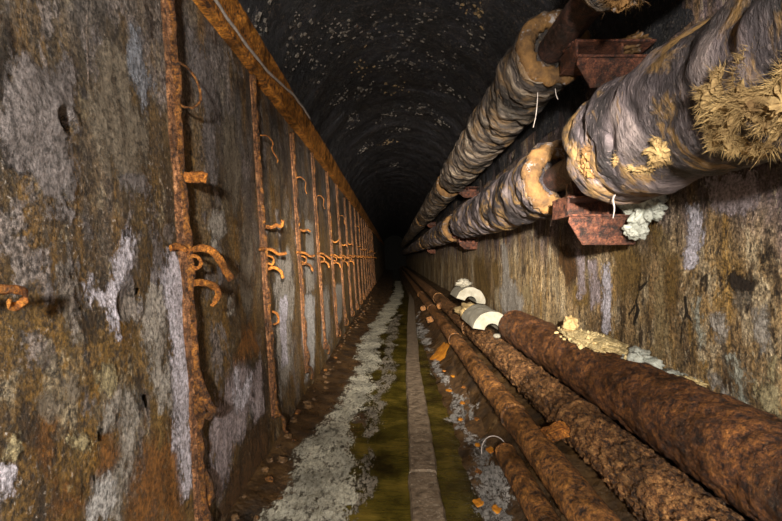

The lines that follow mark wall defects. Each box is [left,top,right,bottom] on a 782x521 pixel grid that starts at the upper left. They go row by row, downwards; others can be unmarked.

water stain [705,170,760,216]
water stain [138,220,193,504]
water stain [208,224,273,521]
water stain [273,220,342,400]
water stain [258,281,404,521]
rust [430,342,493,446]
rust [559,247,588,308]
water stain [574,245,613,334]
rust [610,241,646,298]
crack [629,273,648,326]
water stain [649,202,705,360]
crack [680,296,693,343]